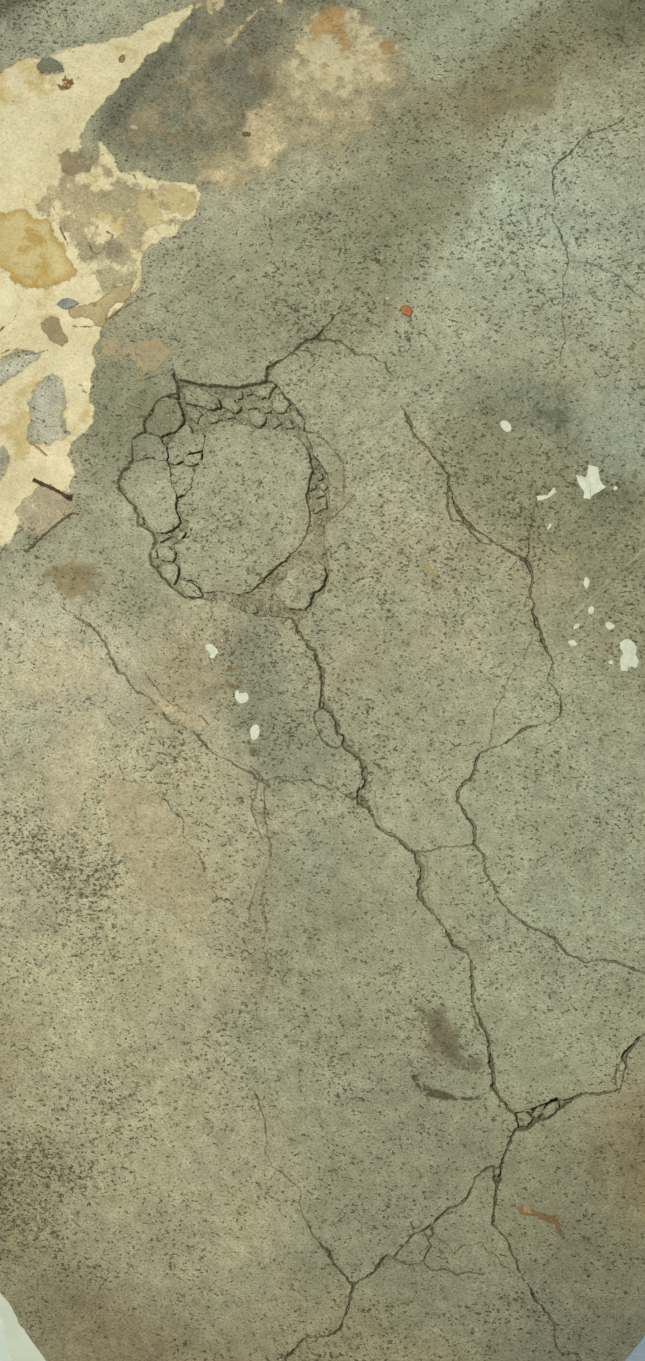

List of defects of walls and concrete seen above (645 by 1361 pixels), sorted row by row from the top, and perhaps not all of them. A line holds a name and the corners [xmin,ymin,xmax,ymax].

peeling [0,0,413,623]
crack [264,306,393,380]
crack [545,117,645,365]
crack [60,407,645,1361]